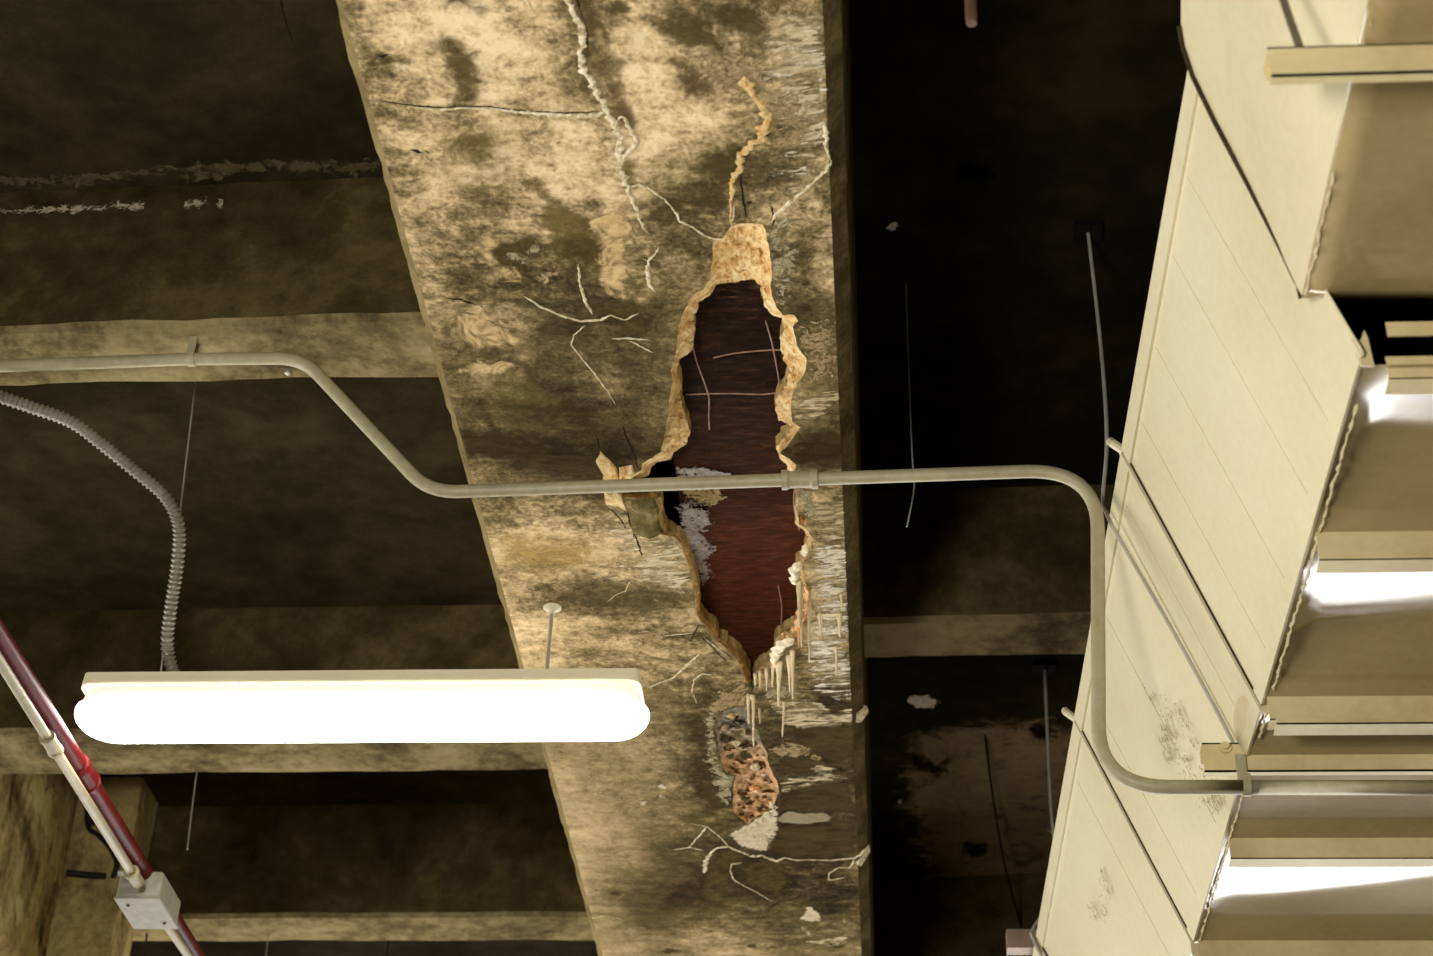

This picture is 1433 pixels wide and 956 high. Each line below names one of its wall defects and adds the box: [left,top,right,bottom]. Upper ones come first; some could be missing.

water stain [441,39,482,105]
water stain [578,0,635,128]
water stain [494,180,600,271]
crack [384,0,837,469]
peeling [589,206,632,299]
water stain [641,155,743,223]
water stain [659,0,827,309]
spalling [596,223,839,686]
water stain [689,489,856,895]
spalling [715,707,779,825]
water stain [895,719,1071,878]
crack [674,824,866,908]